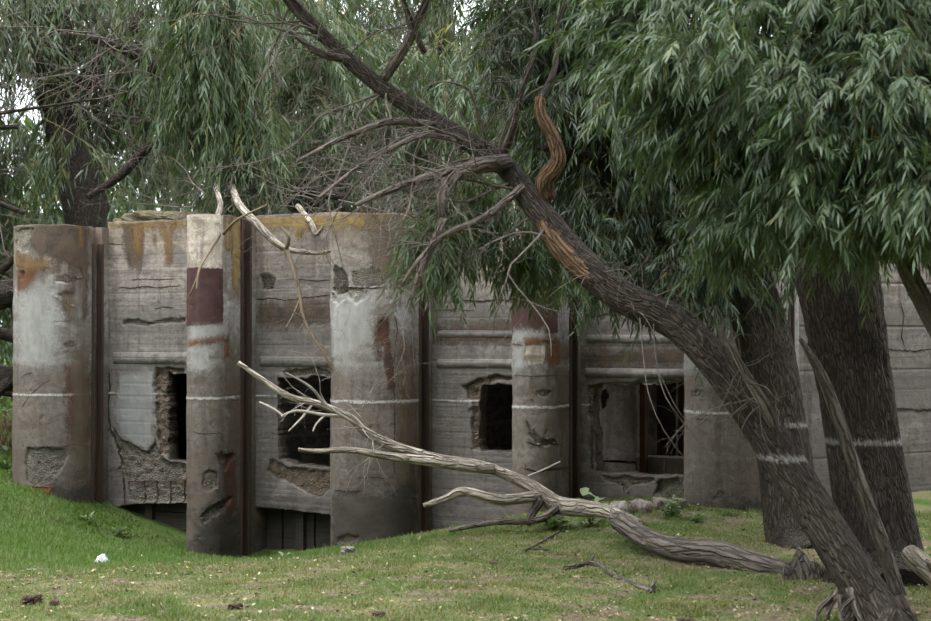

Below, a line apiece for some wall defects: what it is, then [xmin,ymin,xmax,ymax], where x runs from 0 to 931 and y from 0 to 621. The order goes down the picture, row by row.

corrosion [131,222,177,265]
corrosion [15,253,51,291]
spalling [331,265,384,303]
corrosion [189,334,230,357]
crack [897,405,931,413]
crack [108,372,126,505]
spalling [603,475,684,496]